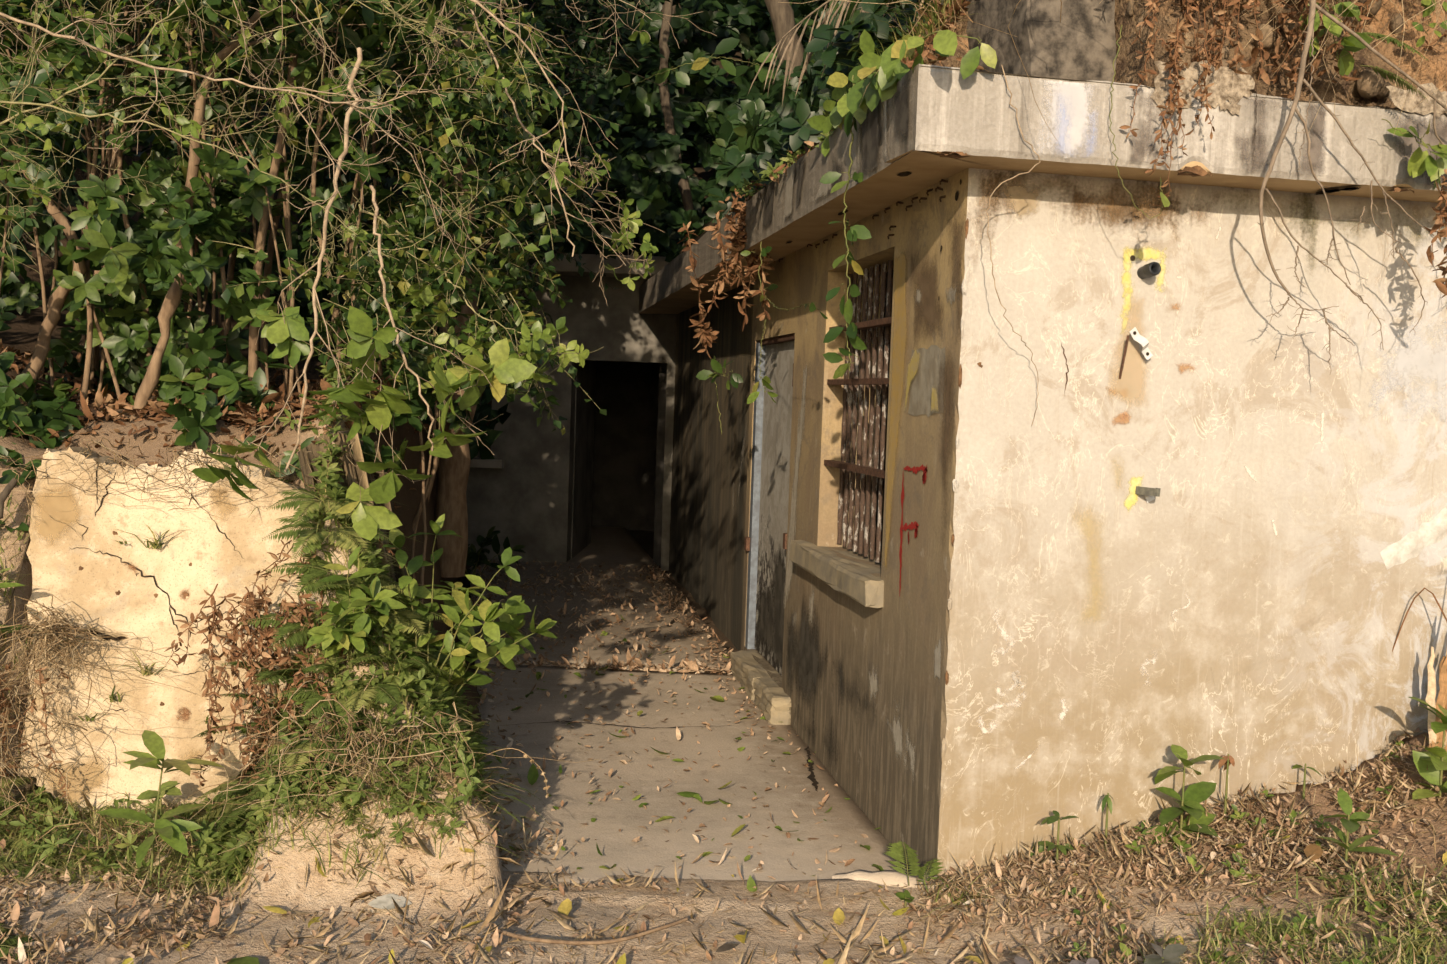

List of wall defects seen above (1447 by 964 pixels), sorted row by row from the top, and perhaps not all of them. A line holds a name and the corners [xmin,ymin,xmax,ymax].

leakage [979,175,1040,217]
leakage [1074,187,1180,222]
leakage [1121,248,1164,332]
leakage [884,222,960,565]
crack [1061,344,1069,390]
leakage [756,550,868,708]